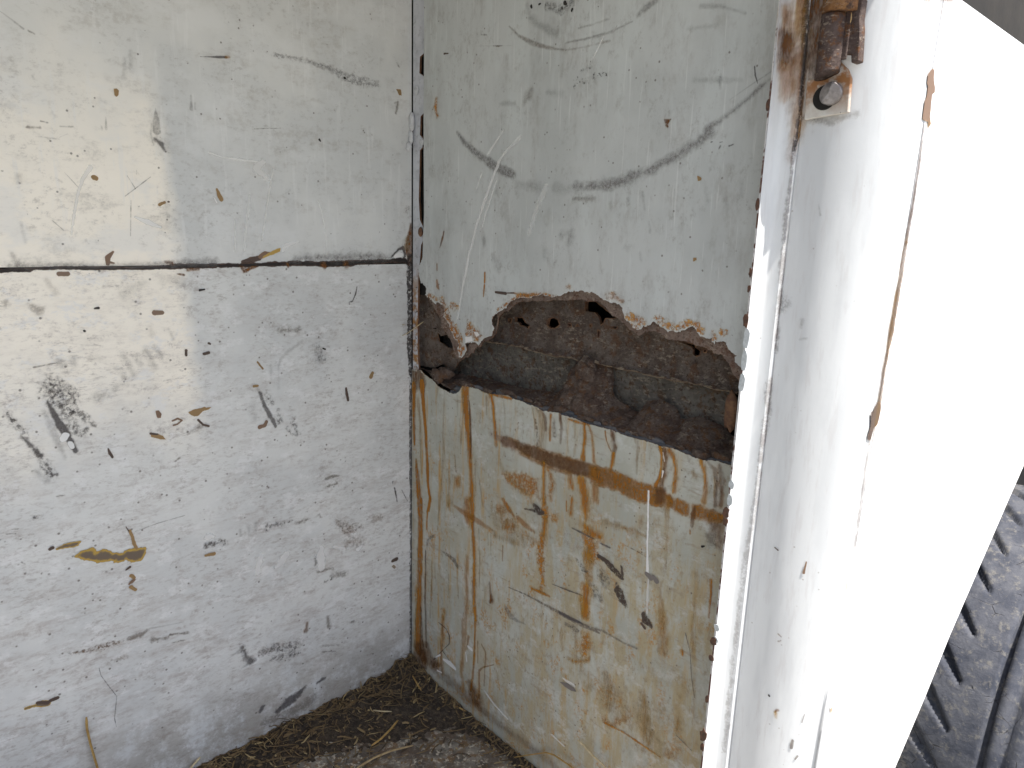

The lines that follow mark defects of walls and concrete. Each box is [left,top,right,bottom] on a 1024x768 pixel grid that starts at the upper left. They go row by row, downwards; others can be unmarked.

corrosion [778,0,823,76]
peeling [594,328,750,395]
peeling [48,527,146,591]
corrosion [412,367,732,705]
peeling [24,696,60,710]